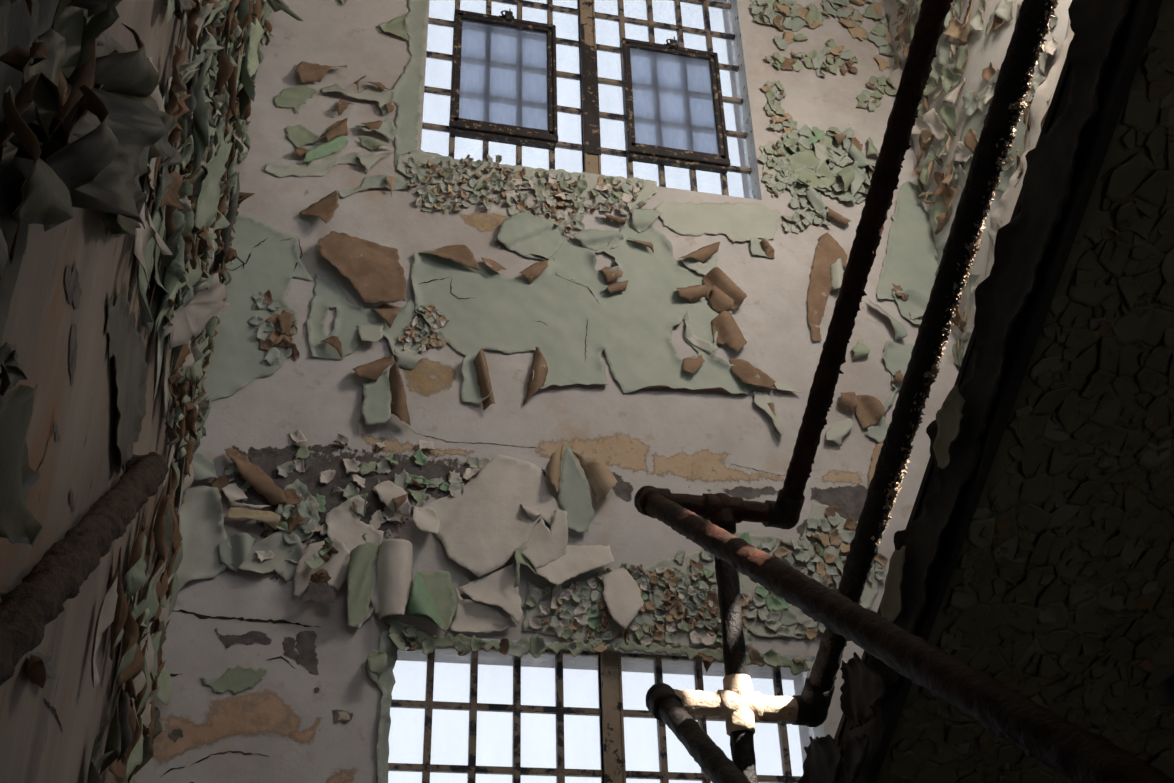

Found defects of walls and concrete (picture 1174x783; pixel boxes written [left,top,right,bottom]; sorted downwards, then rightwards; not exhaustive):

crack [173,609,321,628]
peeling [0,0,922,783]
peeling [734,0,1023,591]
peeling [797,652,1075,783]
peeling [860,0,1174,779]